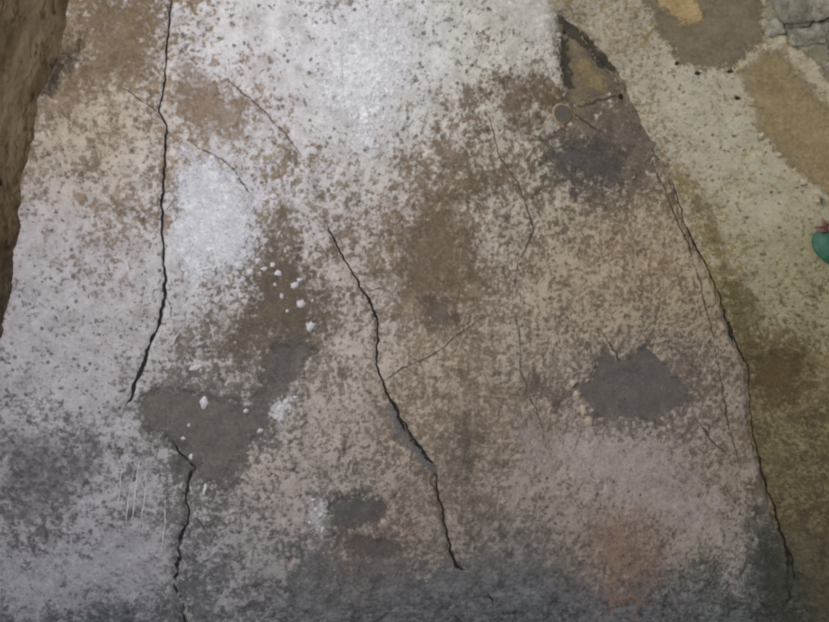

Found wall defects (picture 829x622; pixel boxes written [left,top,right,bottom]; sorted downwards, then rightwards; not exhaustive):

water stain [177,58,260,141]
spalling [554,14,626,108]
crack [108,0,177,405]
water stain [170,145,257,288]
crack [195,145,255,198]
water stain [268,393,296,431]
crack [328,229,490,570]
crack [652,162,795,608]
crack [168,438,207,622]